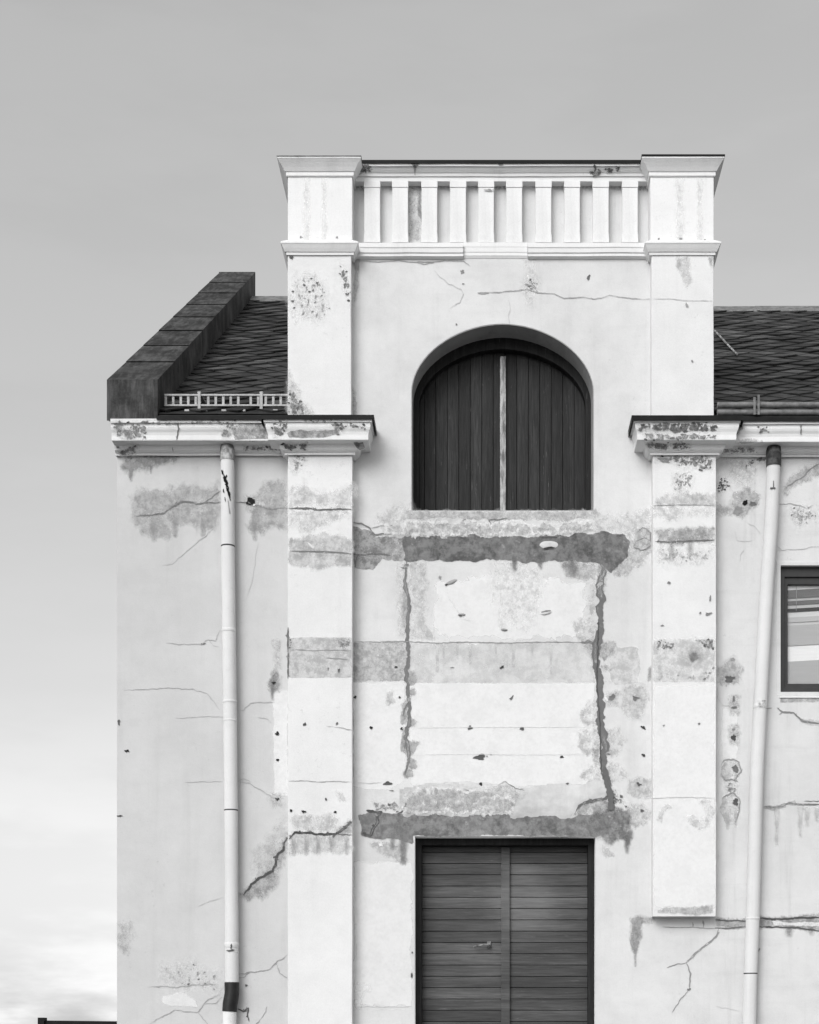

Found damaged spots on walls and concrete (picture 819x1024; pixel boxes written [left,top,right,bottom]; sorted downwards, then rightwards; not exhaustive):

crack [369,260,713,324]
peeling [638,422,718,489]
peeling [353,526,629,575]
flaking render [288,637,407,682]
crack [133,491,626,814]
flaking render [604,645,640,702]
crack [767,708,819,724]
crack [202,803,406,905]
peeling [358,781,606,863]
spalling [719,759,742,829]
crack [764,801,819,844]
crack [667,921,719,1012]